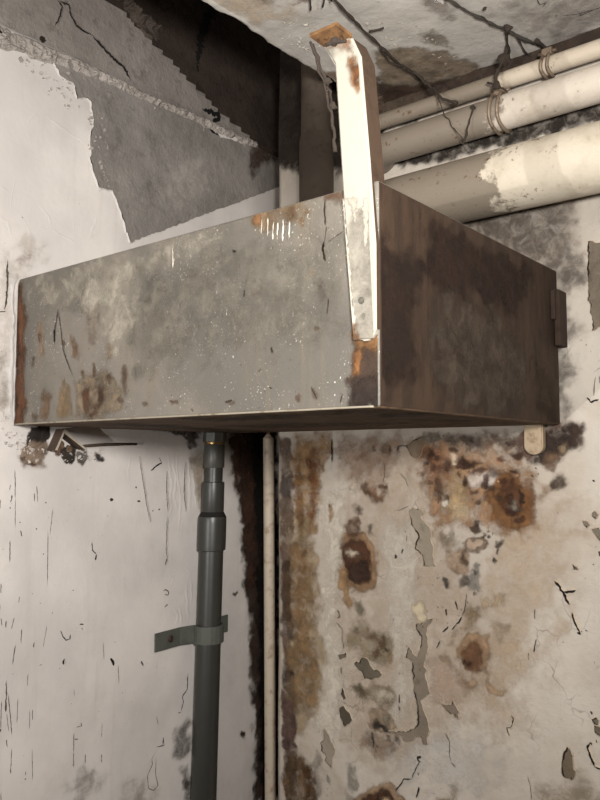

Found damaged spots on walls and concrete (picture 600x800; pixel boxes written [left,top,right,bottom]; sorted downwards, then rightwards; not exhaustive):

spalling [0,26,279,244]
crack [0,261,9,312]
peeling [587,240,600,331]
water stain [424,433,515,465]
crack [139,456,187,565]
efflorescence [468,472,497,488]
mould [550,476,566,489]
water stain [278,437,416,777]
crack [554,579,583,635]
peeling [384,611,437,745]
peeling [561,746,576,780]
crack [586,739,600,770]